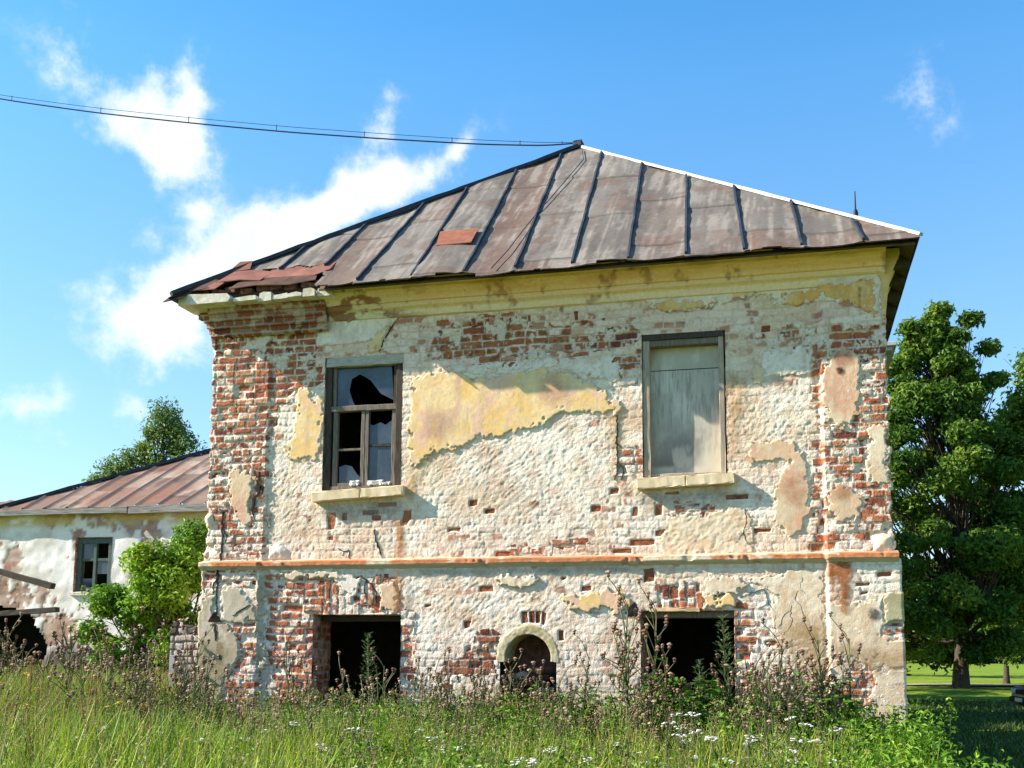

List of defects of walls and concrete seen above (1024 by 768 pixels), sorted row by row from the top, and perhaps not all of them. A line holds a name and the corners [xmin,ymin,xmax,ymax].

spalling [195,318,431,718]
peeling [406,311,643,468]
spalling [610,274,896,554]
peeling [644,568,908,724]